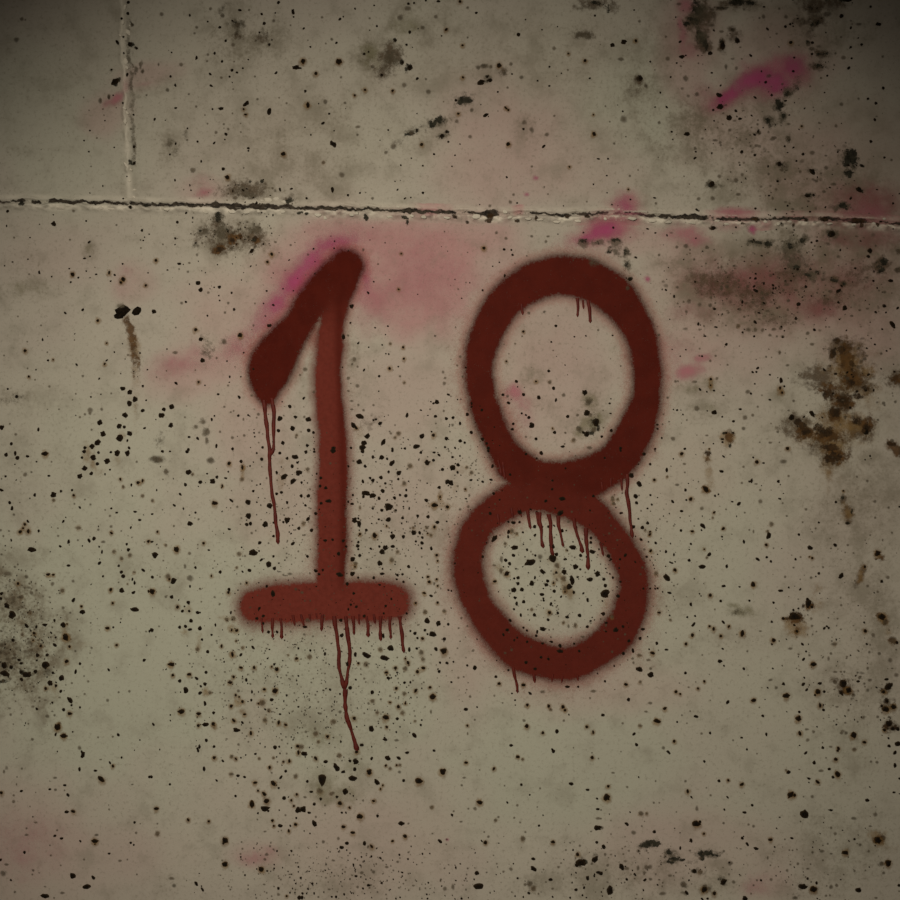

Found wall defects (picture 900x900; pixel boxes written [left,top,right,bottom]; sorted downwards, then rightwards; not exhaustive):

rust [189,1,280,87]
leakage [683,0,754,53]
leakage [758,85,799,134]
leakage [842,149,864,178]
rust [75,316,166,429]
rust [501,341,568,471]
rust [723,786,886,900]